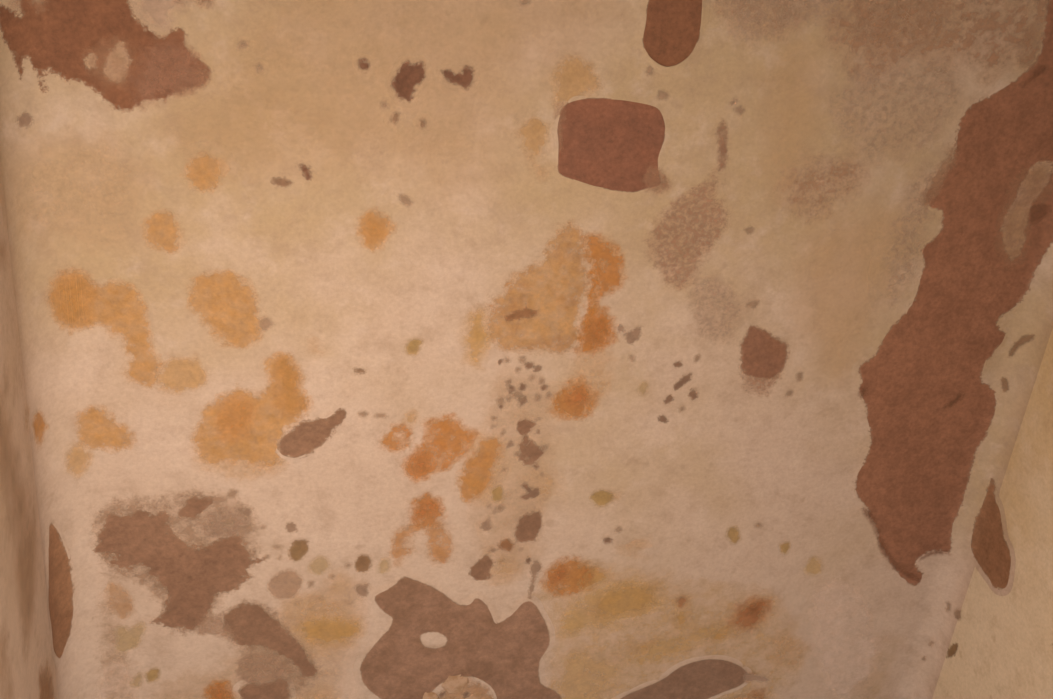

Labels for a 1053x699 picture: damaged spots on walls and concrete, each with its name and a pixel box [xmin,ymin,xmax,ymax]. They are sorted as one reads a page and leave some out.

peeling [0,0,211,111]
peeling [634,0,710,75]
peeling [17,113,32,127]
peeling [549,90,673,200]
peeling [848,0,1053,596]
peeling [740,326,788,394]
leakage [109,584,144,651]
peeling [45,490,335,699]
peeling [346,511,567,699]
rust [546,561,606,596]
leakage [147,669,159,682]
peeling [611,654,767,699]